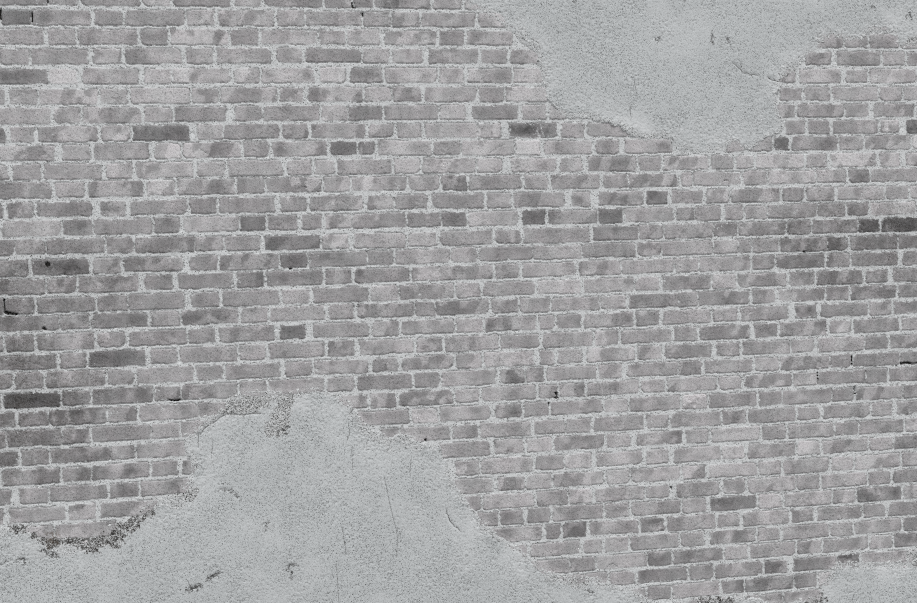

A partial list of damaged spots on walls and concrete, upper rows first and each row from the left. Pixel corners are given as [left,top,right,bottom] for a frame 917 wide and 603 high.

peeling [464,0,673,145]
spalling [0,386,769,603]
peeling [784,547,917,603]